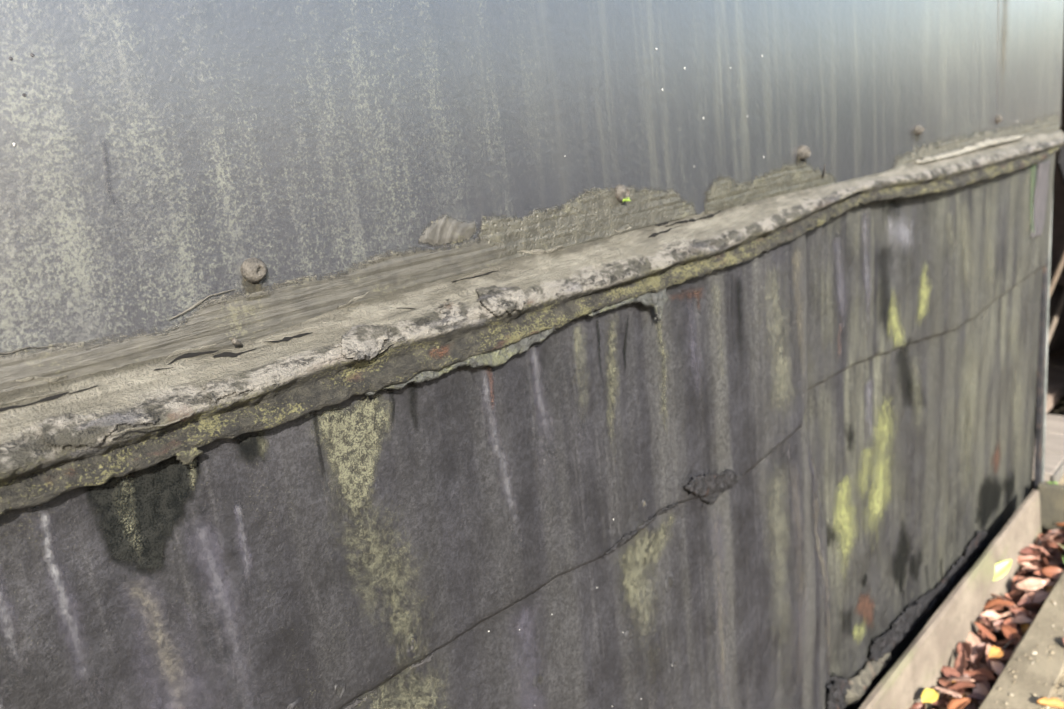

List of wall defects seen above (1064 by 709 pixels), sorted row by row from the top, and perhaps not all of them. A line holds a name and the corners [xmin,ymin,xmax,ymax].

peeling [1030,160,1050,238]
peeling [476,285,527,316]
peeling [334,324,389,361]
peeling [38,412,159,448]
leakage [86,456,200,574]
peeling [977,476,1015,527]
leakage [42,515,77,643]
leakage [199,529,230,615]
peeling [892,528,921,589]